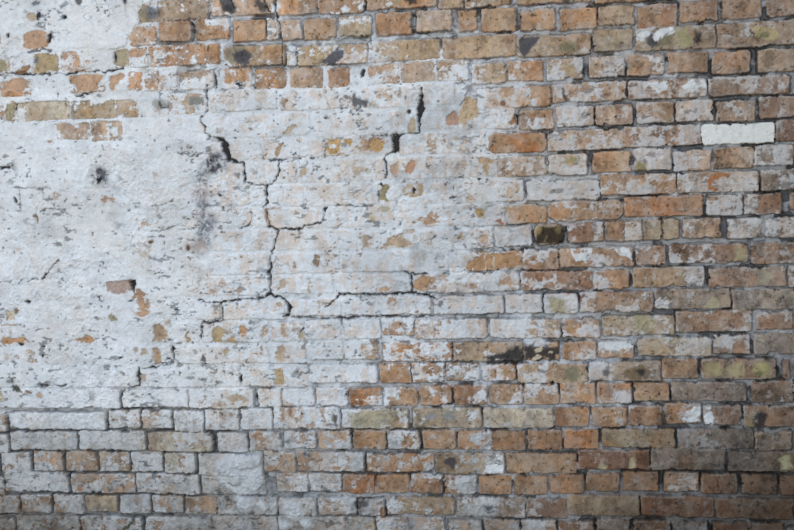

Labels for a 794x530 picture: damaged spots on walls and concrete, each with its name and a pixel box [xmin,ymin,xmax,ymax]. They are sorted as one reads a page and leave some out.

spalling [0,0,147,125]
crack [197,68,436,340]
spalling [97,278,172,366]